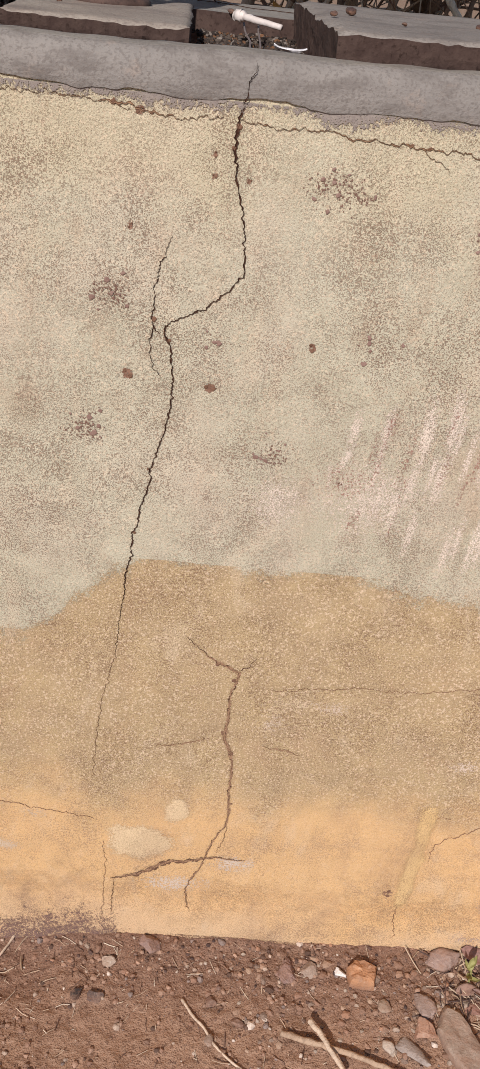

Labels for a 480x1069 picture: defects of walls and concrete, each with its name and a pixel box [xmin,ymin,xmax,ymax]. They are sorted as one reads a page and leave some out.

crack [0,638,257,919]
leakage [0,379,480,948]
crack [1,63,480,776]
crack [391,818,480,938]